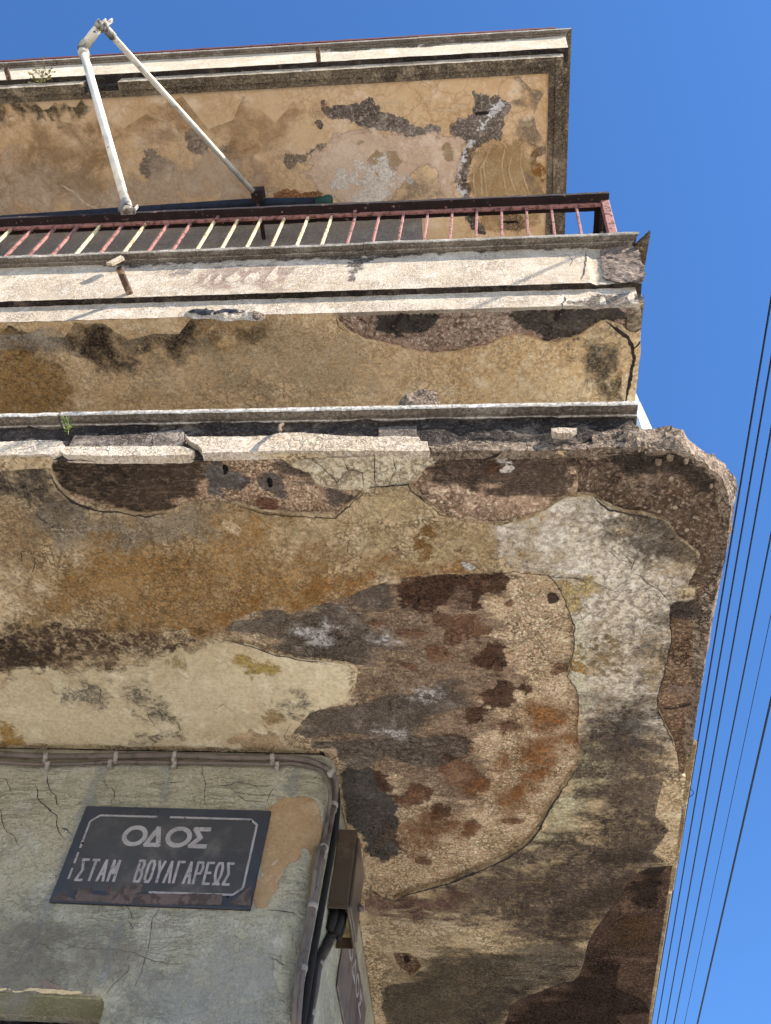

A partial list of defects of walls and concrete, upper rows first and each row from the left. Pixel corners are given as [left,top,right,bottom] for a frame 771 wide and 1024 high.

peeling [0,91,511,215]
damp [0,319,363,414]
spalling [338,307,636,353]
crack [606,321,640,401]
spalling [52,457,361,512]
spalling [411,424,738,773]
crack [0,771,72,849]
crack [150,765,278,804]
spalling [0,570,580,908]
damp [0,468,700,1024]
crack [32,906,180,992]
spalling [505,865,673,1024]